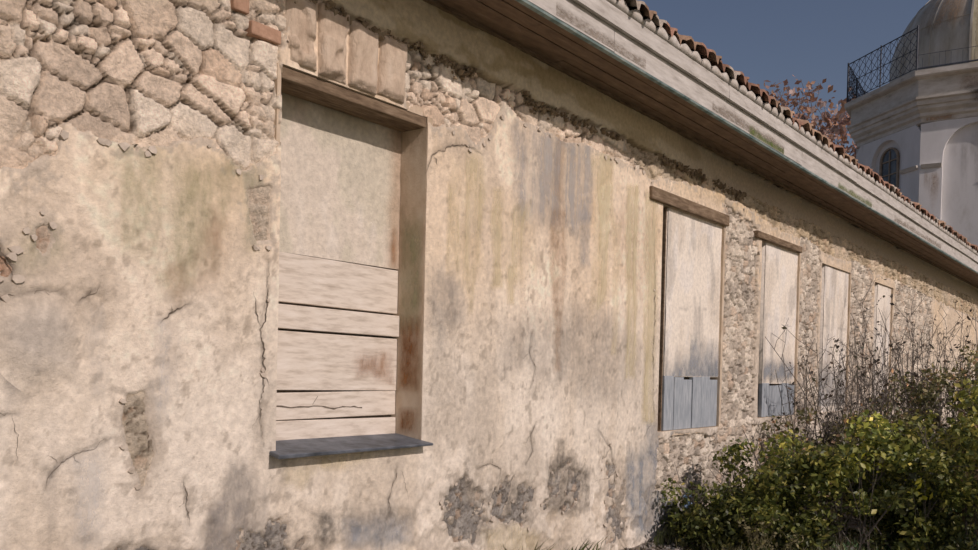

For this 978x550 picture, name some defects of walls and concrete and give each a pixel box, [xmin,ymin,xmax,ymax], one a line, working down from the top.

spalling [0,0,289,254]
crack [0,248,49,303]
crack [252,268,362,433]
water stain [540,138,611,305]
spalling [405,43,978,506]
spalling [119,392,154,490]
spalling [439,458,580,550]